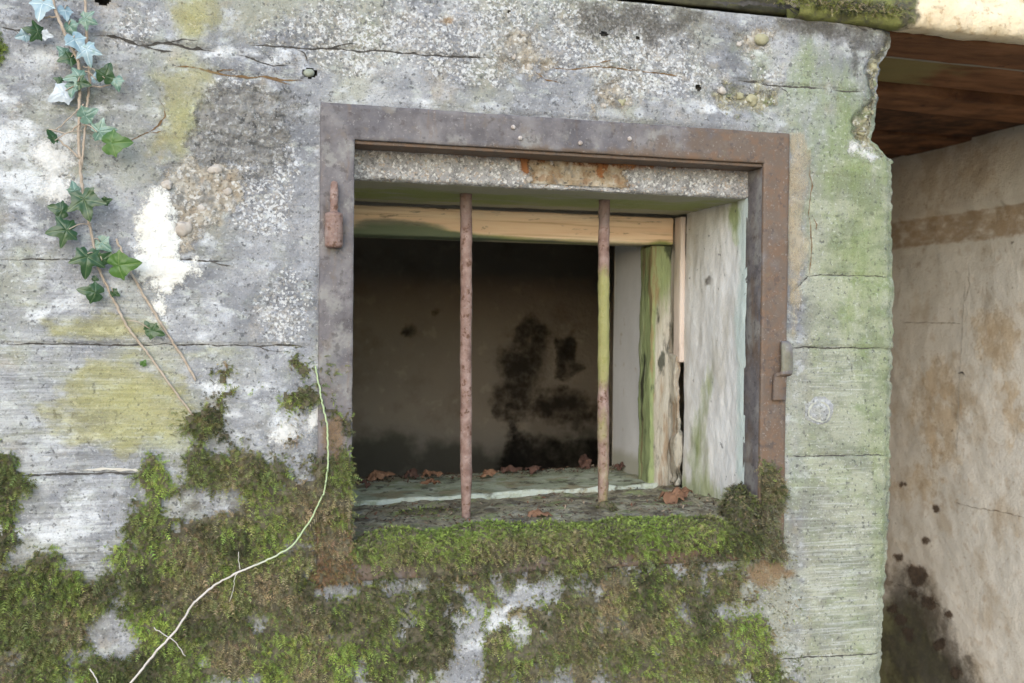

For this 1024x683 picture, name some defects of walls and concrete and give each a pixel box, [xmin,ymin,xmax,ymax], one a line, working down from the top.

crack [94,35,488,85]
rust [564,152,654,178]
spalling [133,82,301,317]
crack [0,255,71,263]
crack [179,258,230,266]
crack [8,343,303,352]
damp [492,318,598,471]